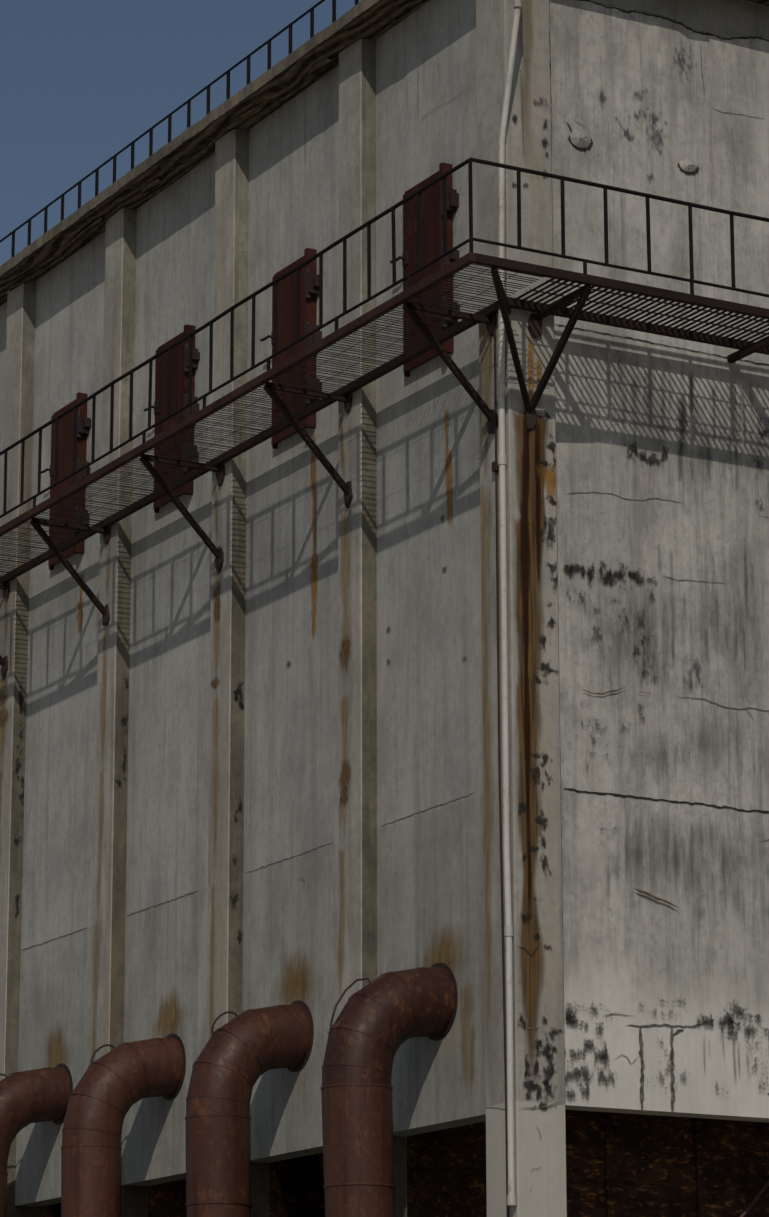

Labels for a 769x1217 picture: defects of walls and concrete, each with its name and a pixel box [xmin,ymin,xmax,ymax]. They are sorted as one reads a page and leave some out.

crack [578,0,768,119]
mould [540,412,556,468]
mould [539,496,556,547]
mould [536,560,658,684]
corrosion [515,412,555,1061]
crack [564,788,769,842]